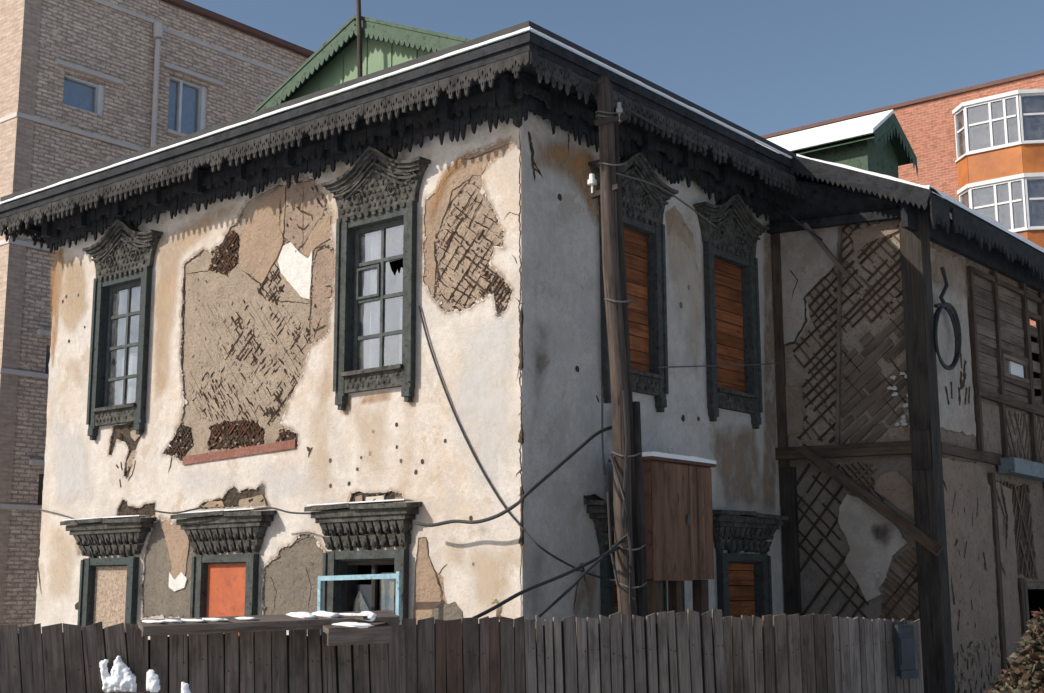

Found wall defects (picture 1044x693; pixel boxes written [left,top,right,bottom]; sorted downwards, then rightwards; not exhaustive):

peeling [108,421,196,619]
flaking render [199,483,270,509]
peeling [164,176,336,465]
peeling [262,534,324,615]
peeling [413,537,447,624]
peeling [422,139,524,371]
crack [491,131,543,620]
peeling [887,372,910,428]